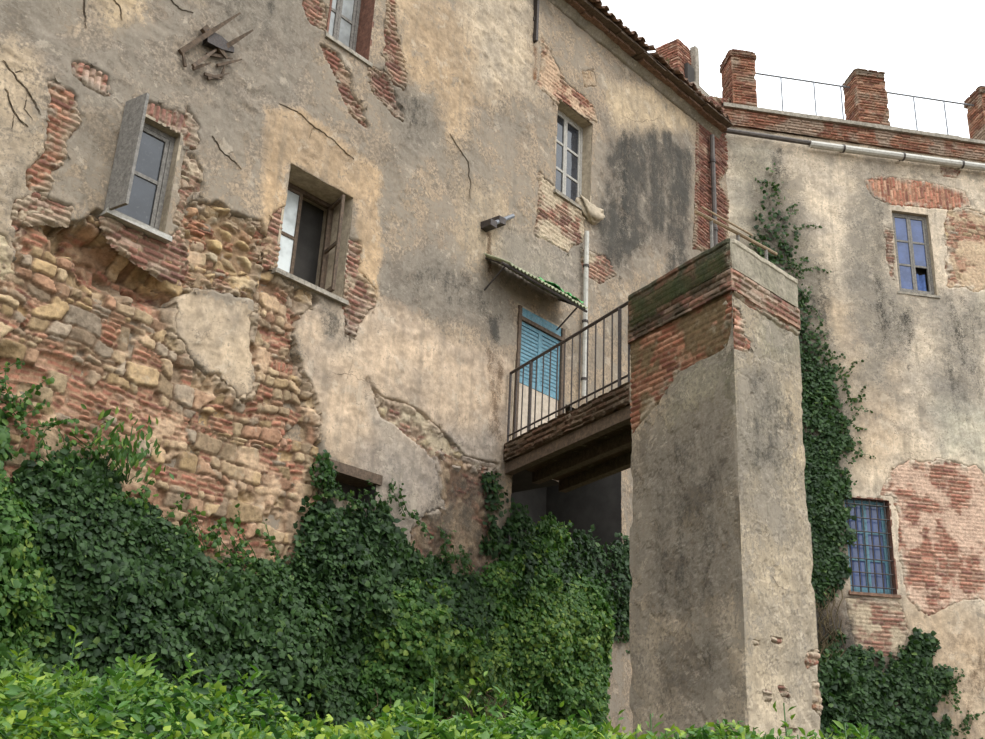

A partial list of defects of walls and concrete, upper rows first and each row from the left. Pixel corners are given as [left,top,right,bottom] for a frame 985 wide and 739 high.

crack [3,60,41,129]
flaking render [71,62,114,96]
flaking render [322,0,413,130]
flaking render [536,39,598,123]
flaking render [0,76,322,580]
flaking render [342,240,378,339]
crack [438,134,472,199]
flaking render [533,172,622,284]
flaking render [692,121,730,251]
flaking render [630,291,800,434]
flaking render [865,167,985,292]
flaking render [845,458,985,658]